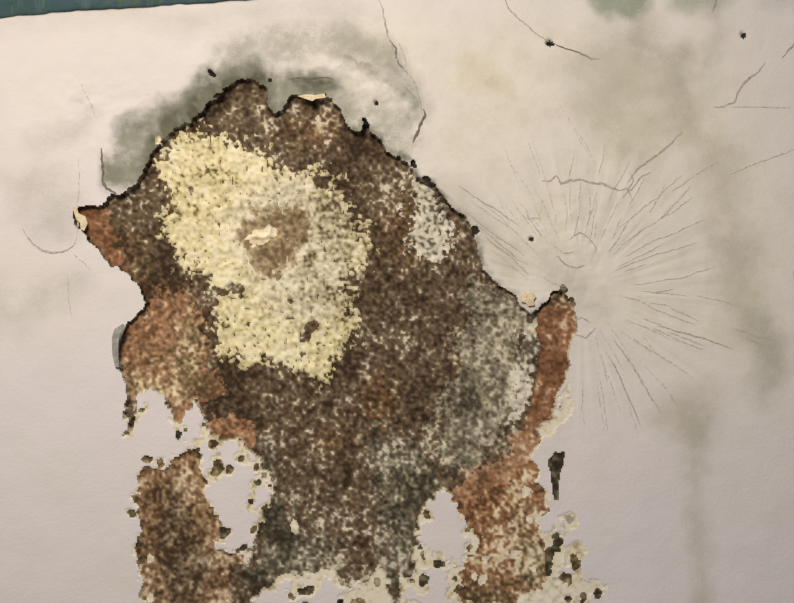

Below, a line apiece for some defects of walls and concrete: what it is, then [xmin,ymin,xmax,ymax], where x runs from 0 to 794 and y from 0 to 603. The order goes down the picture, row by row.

water stain [103,34,373,185]
crack [379,0,426,142]
crack [505,0,595,59]
crack [720,43,794,108]
spalling [72,78,609,603]
crack [459,99,793,434]